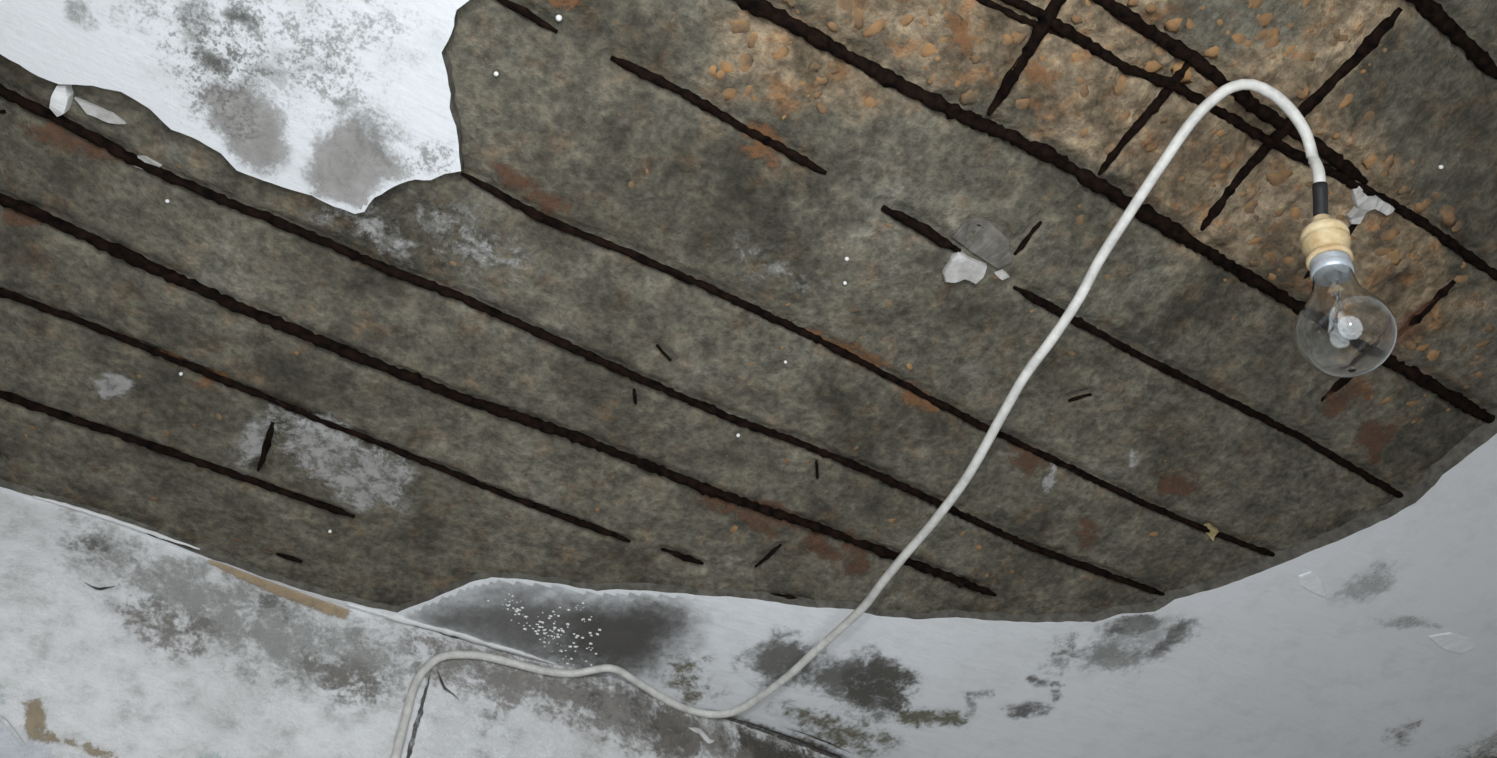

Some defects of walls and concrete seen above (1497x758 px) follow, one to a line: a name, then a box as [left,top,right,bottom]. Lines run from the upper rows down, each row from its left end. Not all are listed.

leakage [185,5,251,73]
corrosion [740,123,786,167]
spalling [767,0,1219,197]
spalling [0,0,1125,619]
corrosion [812,329,891,371]
corrosion [903,383,939,412]
spalling [864,0,1497,622]
leakage [237,415,415,511]
leakage [82,531,982,758]
leakage [1009,614,1188,718]